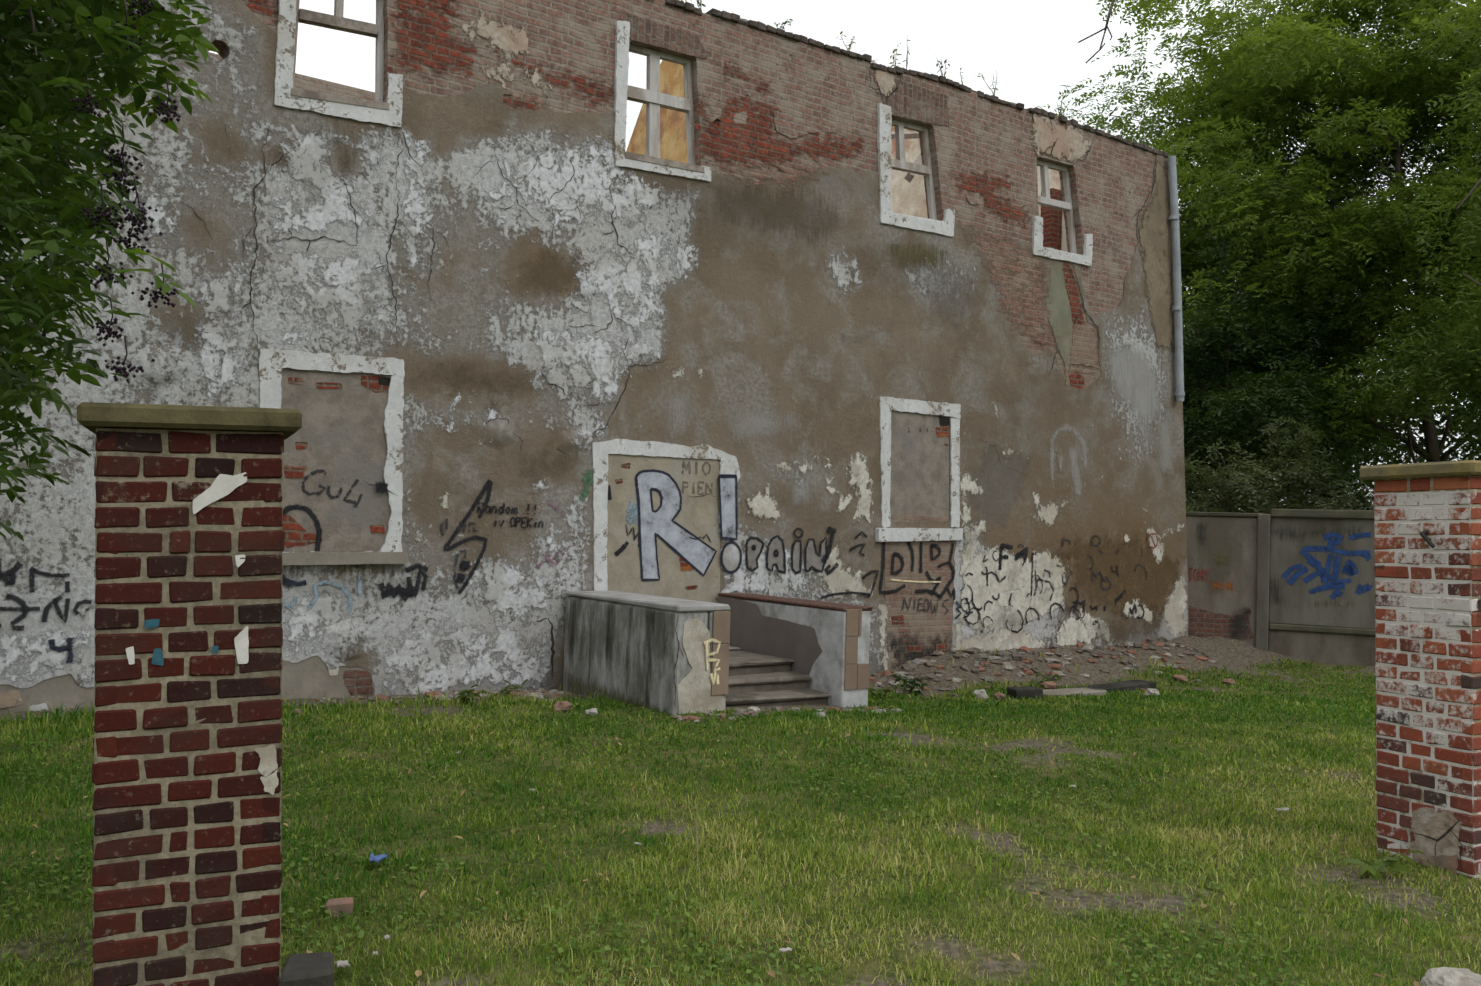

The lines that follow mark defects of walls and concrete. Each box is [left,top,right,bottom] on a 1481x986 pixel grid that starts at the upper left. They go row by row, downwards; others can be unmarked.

flaking render [387,0,613,111]
flaking render [692,63,864,194]
crack [180,116,449,347]
crack [473,148,631,254]
flaking render [948,170,1101,390]
flaking render [1139,160,1175,353]
crack [542,311,664,442]
peeling [0,621,95,713]